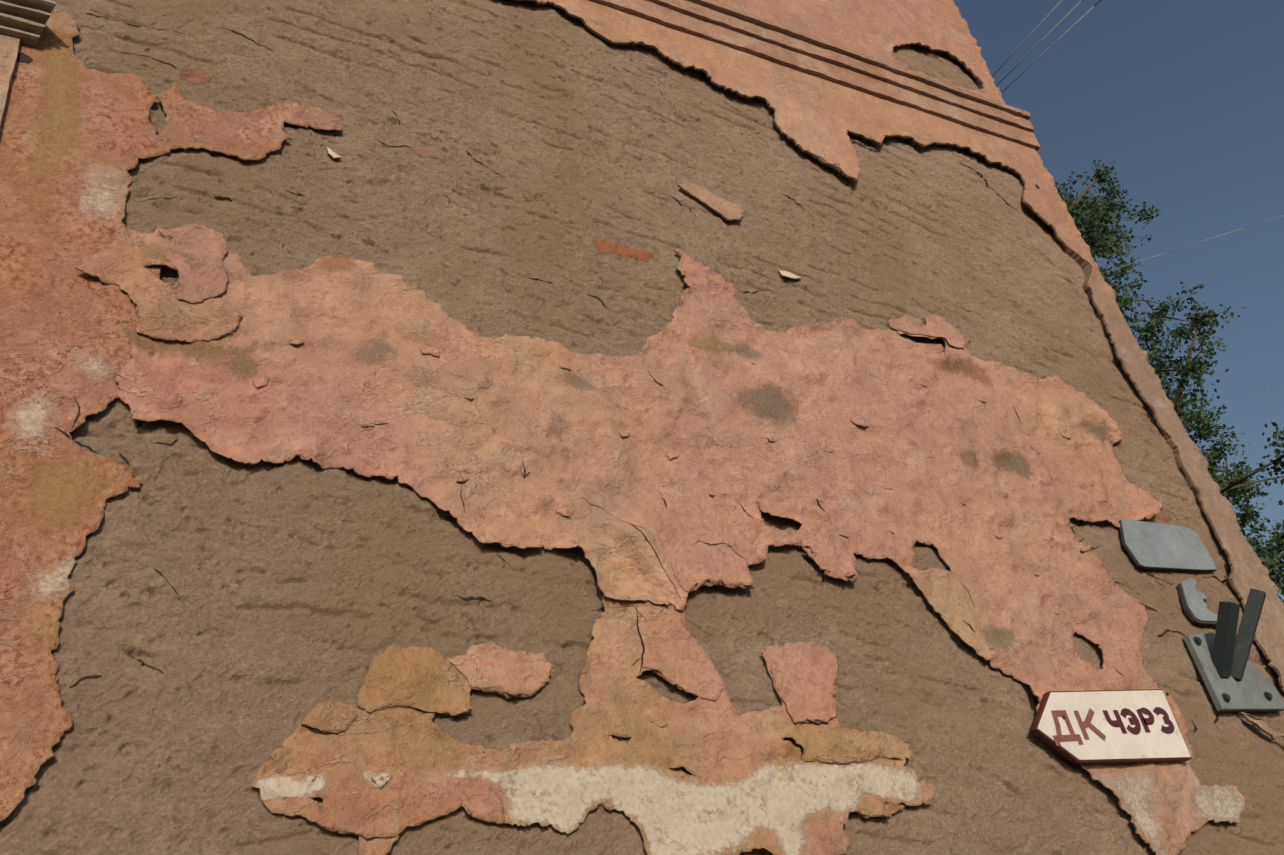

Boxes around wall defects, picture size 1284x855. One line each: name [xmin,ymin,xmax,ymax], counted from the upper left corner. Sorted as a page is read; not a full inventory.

spalling [51,0,1163,437]
peeling [0,223,1246,855]
crack [581,497,681,678]
spalling [1067,429,1284,855]